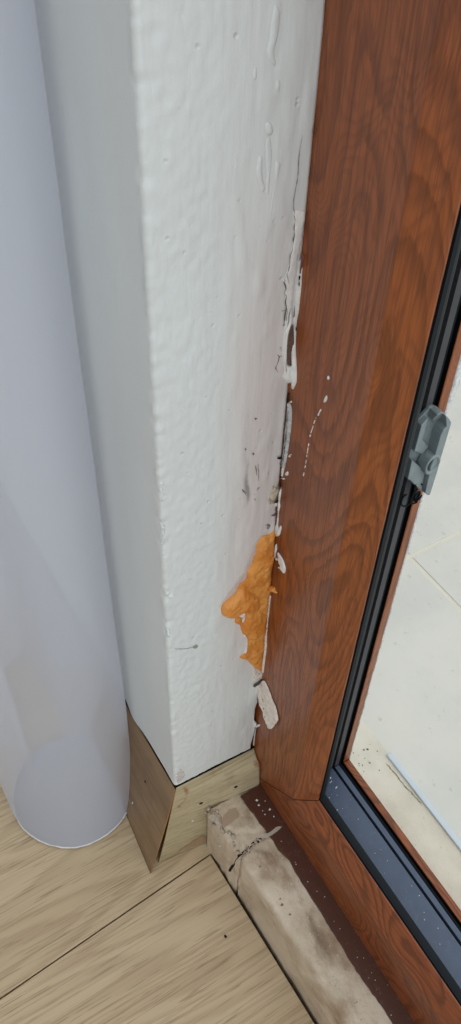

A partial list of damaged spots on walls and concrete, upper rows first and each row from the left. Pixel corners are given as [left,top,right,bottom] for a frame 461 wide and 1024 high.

crack [283,135,303,326]
crack [229,826,281,872]